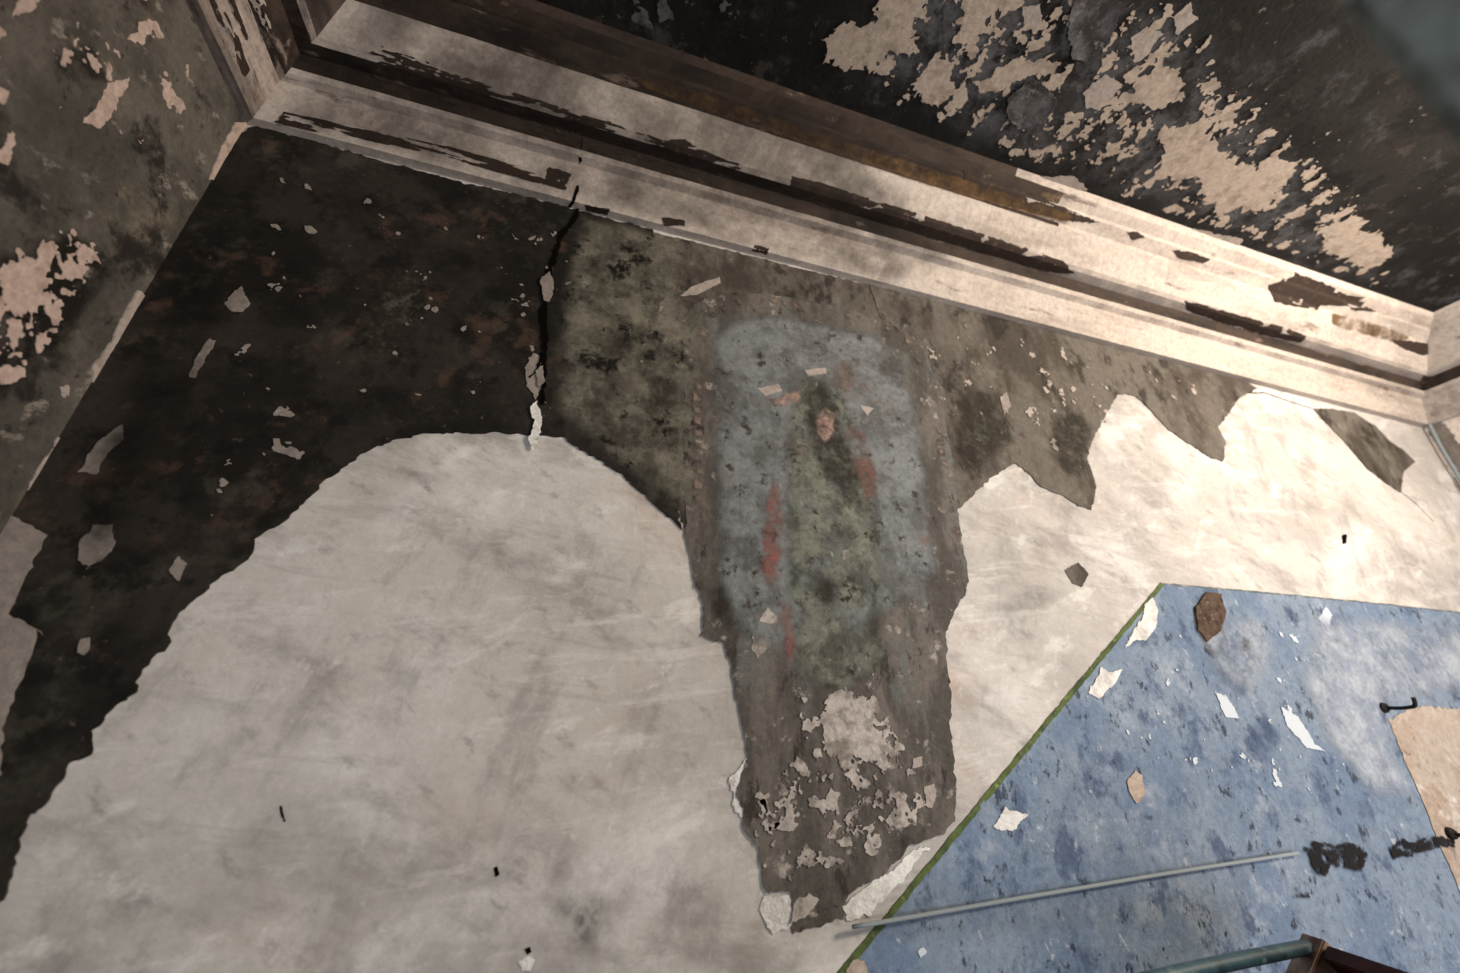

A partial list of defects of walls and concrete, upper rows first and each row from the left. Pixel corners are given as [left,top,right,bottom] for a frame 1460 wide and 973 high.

peeling [159,64,189,114]
peeling [370,46,741,190]
peeling [821,0,1393,312]
peeling [1185,301,1306,343]
peeling [1390,339,1428,355]
peeling [1313,408,1415,493]
flaking render [1430,422,1460,474]
peeling [0,112,1258,902]
peeling [1208,606,1460,891]
flaking render [759,846,930,934]
flaking render [518,947,536,971]
spalling [846,959,868,973]